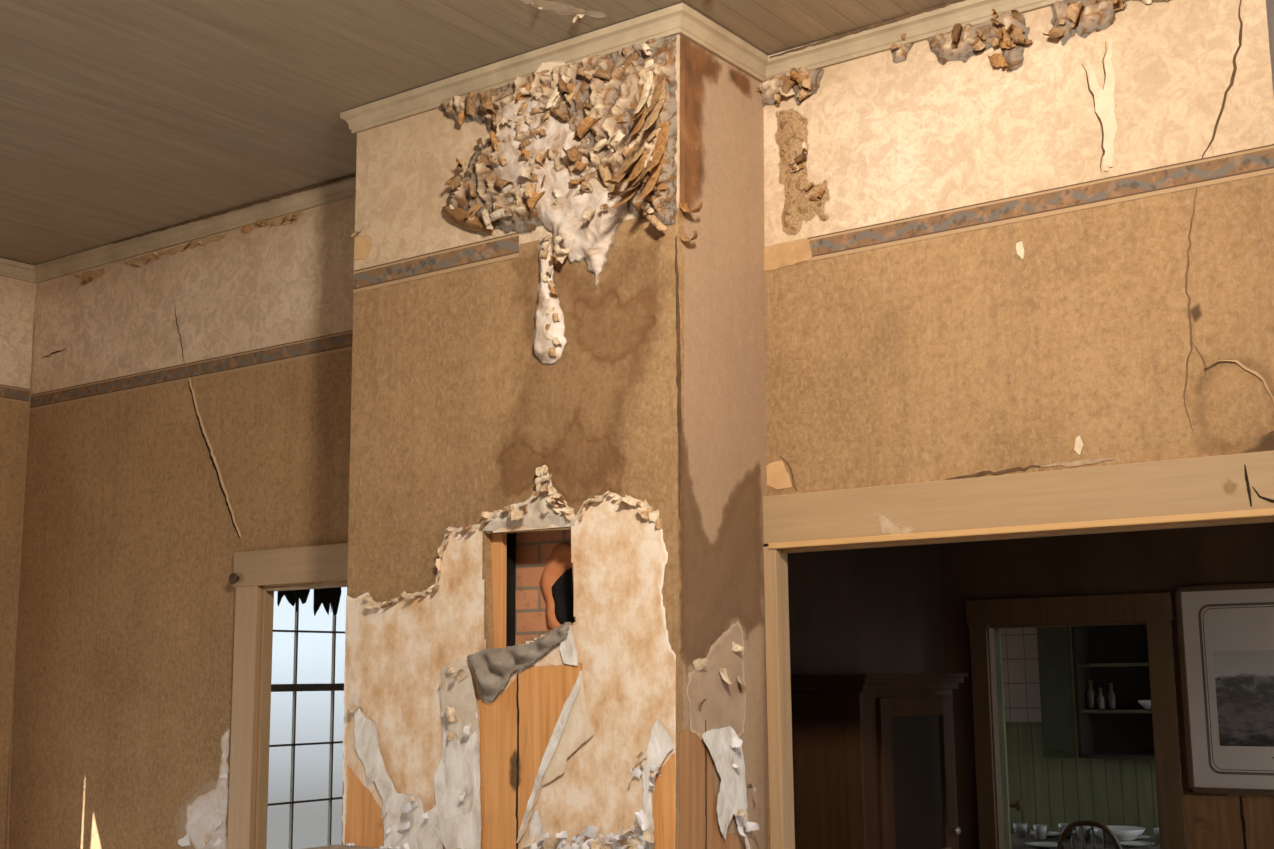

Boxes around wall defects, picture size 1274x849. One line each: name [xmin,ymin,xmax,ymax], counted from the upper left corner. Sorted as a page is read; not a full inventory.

crack [1202,0,1243,158]
peeling [439,35,677,358]
crack [1183,187,1274,431]
crack [174,303,241,538]
spalling [363,465,662,648]
peeling [686,621,747,750]
flaking render [178,729,230,849]